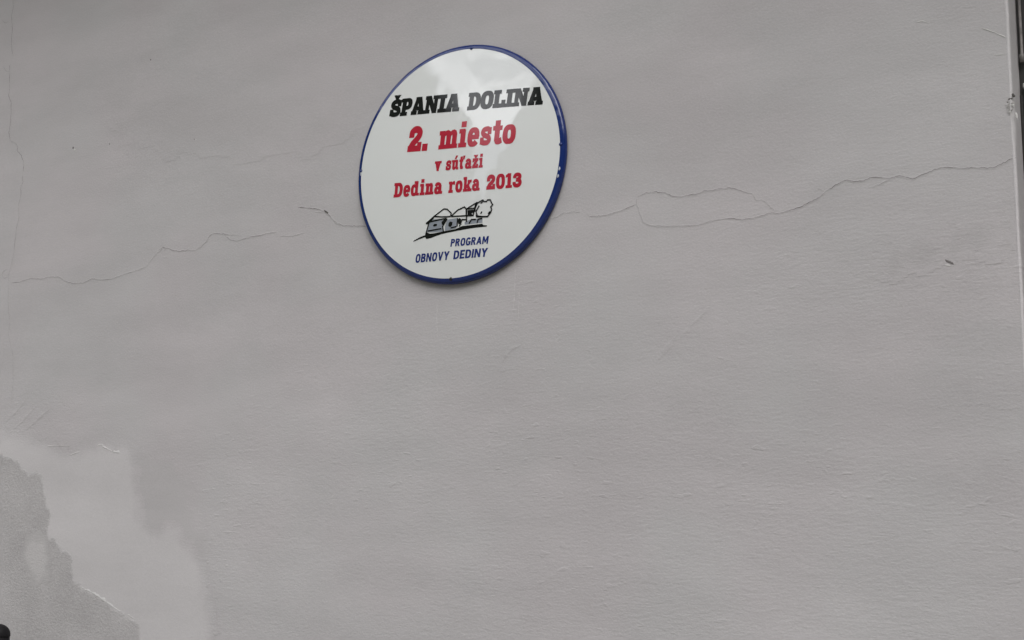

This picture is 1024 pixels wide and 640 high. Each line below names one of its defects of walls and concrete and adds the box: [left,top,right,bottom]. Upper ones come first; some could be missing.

crack [548,157,1016,228]
crack [12,206,366,285]